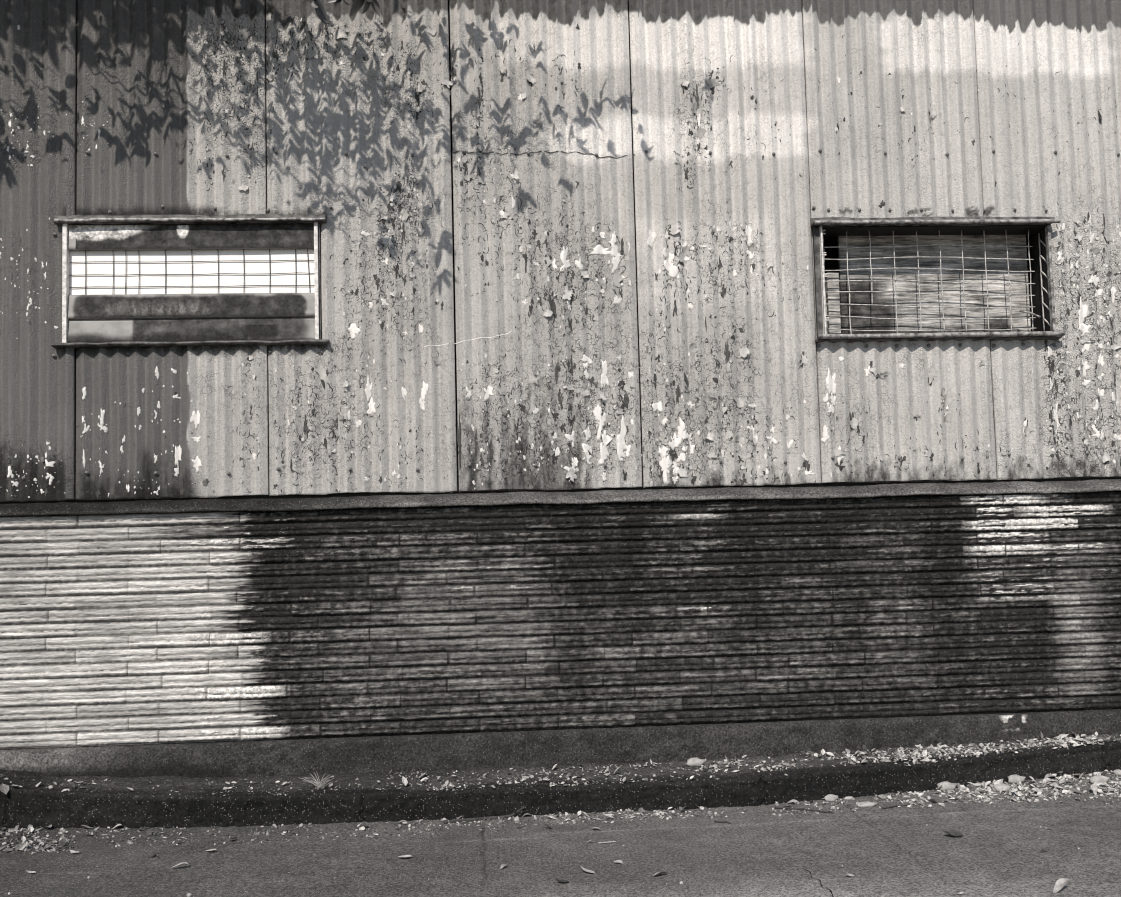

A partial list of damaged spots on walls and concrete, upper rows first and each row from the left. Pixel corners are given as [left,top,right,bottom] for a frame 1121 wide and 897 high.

peeling [184,1,458,191]
peeling [865,89,946,168]
peeling [228,33,816,494]
peeling [1044,208,1121,470]
peeling [0,434,66,499]
peeling [76,361,214,500]
peeling [821,357,1032,478]